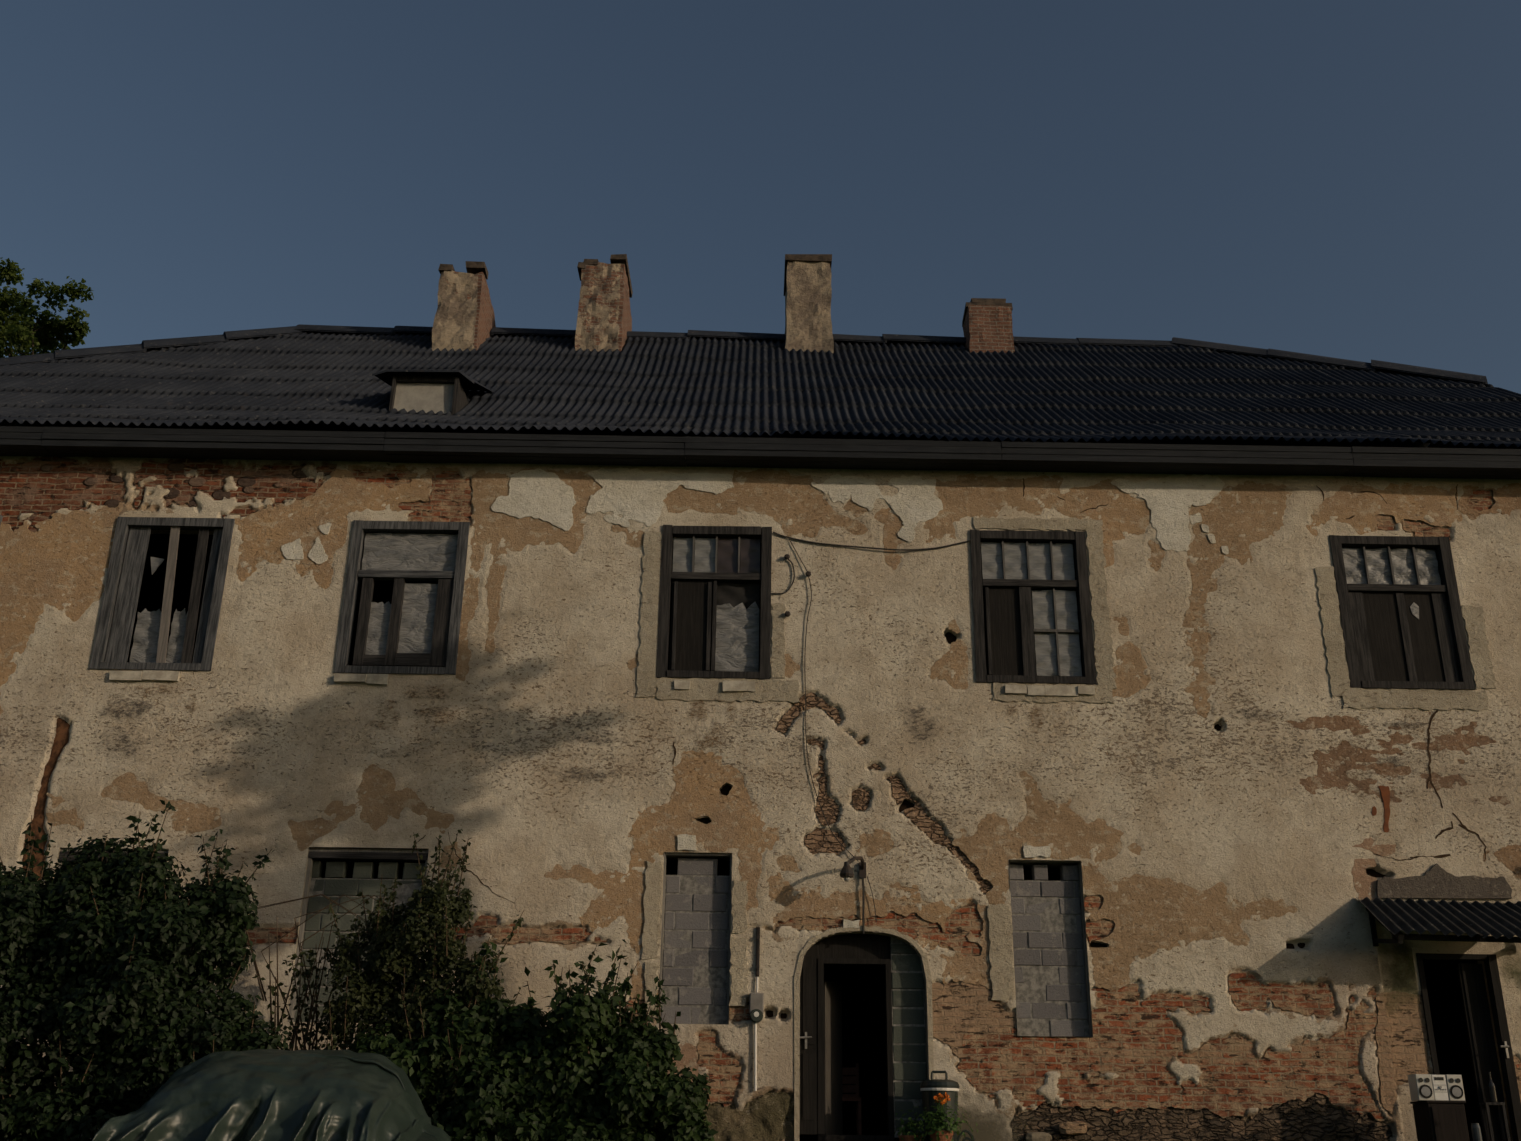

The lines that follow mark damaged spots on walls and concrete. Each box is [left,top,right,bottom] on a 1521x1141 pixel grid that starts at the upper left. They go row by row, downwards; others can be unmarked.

peeling [663,468,905,570]
peeling [923,473,1166,571]
peeling [1306,482,1521,540]
peeling [0,457,603,714]
peeling [1182,481,1293,731]
corrosion [22,718,70,881]
peeling [101,772,222,834]
peeling [288,764,462,870]
spalling [776,693,841,734]
spalling [1287,715,1497,803]
crack [1375,710,1486,861]
flaking render [451,739,1429,1141]